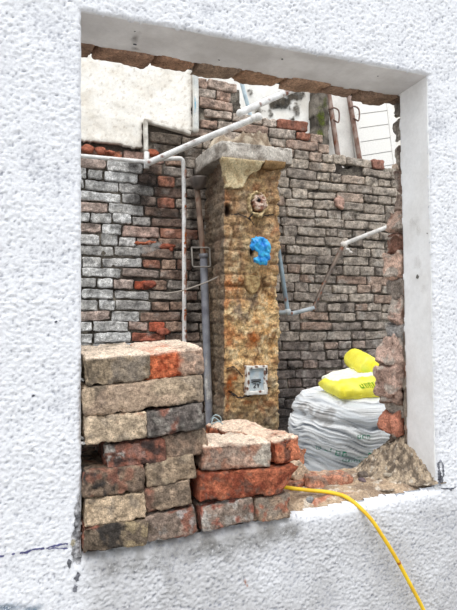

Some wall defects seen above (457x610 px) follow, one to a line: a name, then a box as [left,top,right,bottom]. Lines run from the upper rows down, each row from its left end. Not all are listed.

spalling [81,144,115,155]
peeling [219,157,286,189]
flaking render [67,495,82,592]